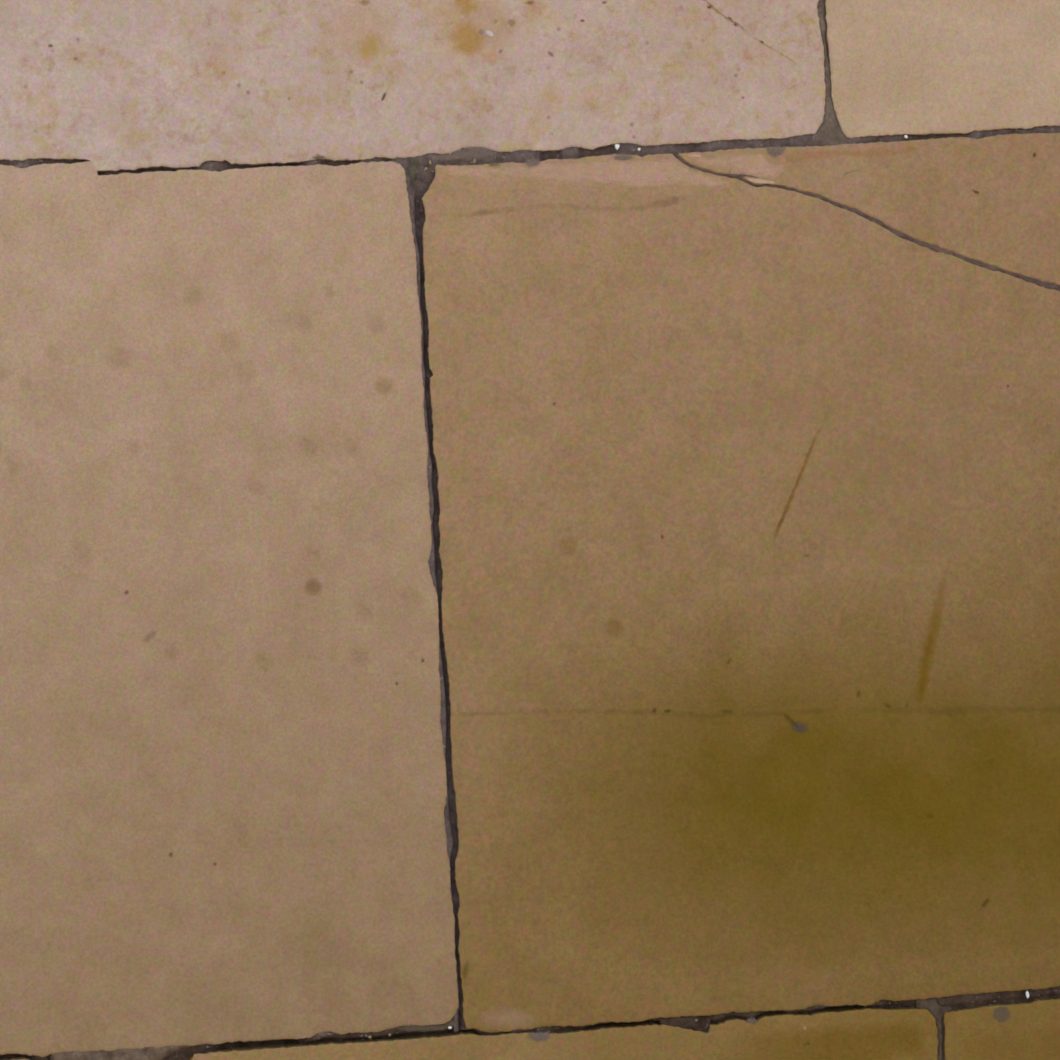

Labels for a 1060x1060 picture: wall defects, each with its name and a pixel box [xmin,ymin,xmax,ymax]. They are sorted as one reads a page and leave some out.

crack [672,152,1060,291]
leakage [683,710,1060,860]
spalling [50,1045,194,1060]